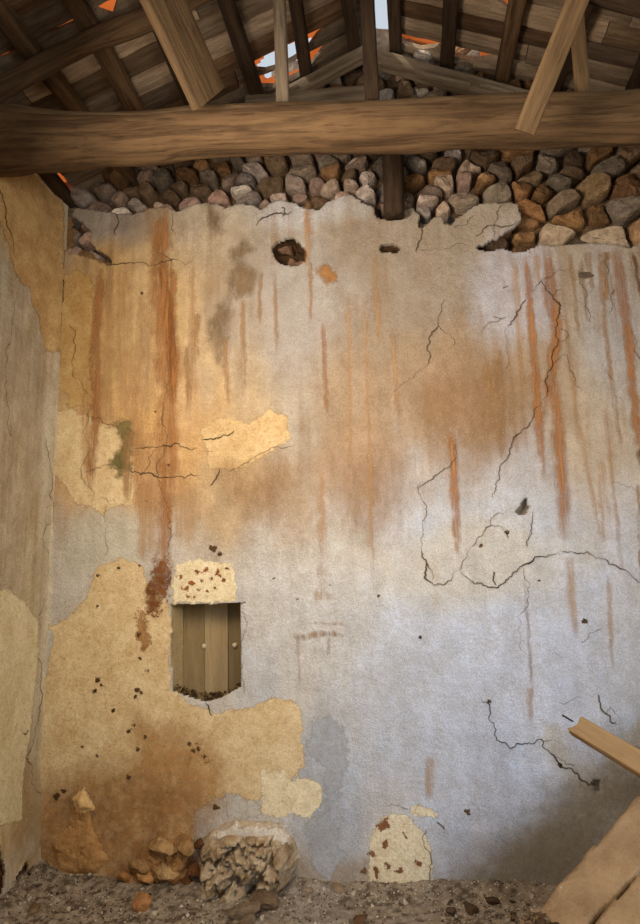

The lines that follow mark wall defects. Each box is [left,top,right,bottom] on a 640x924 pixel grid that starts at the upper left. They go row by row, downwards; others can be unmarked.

spalling [404,146,640,253]
corrosion [134,217,178,652]
spalling [0,154,384,515]
crack [417,254,638,612]
corrosion [525,263,567,523]
corrosion [604,253,640,455]
peeling [0,545,323,877]
peeling [360,803,438,883]
crack [483,702,588,784]
crack [598,695,616,724]